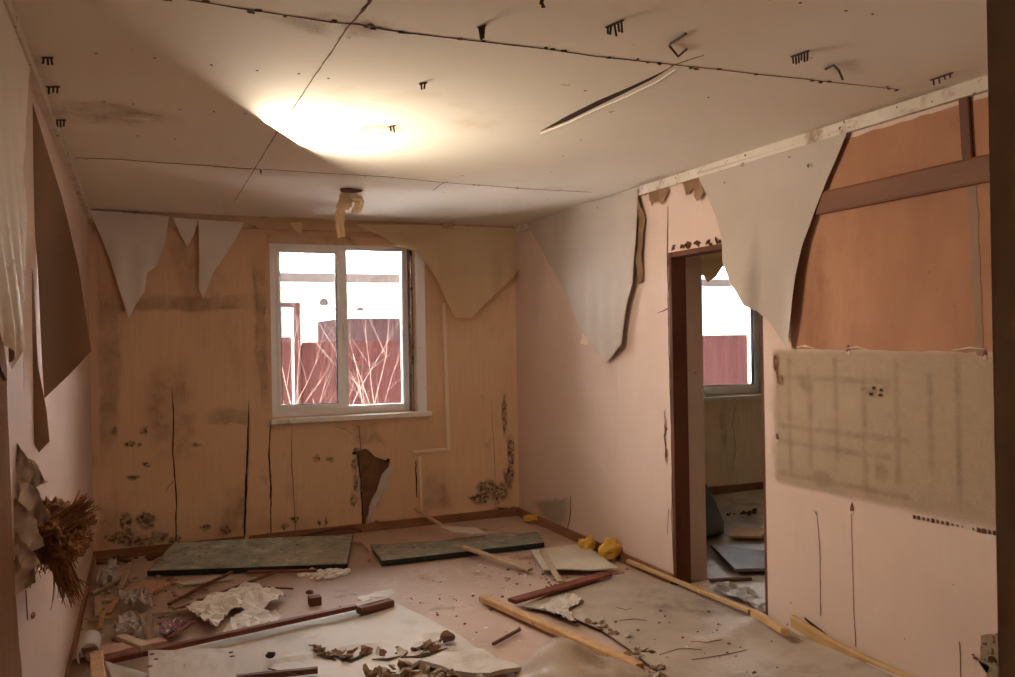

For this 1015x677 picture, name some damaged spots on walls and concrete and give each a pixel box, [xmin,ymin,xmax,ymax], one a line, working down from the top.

crack [90,0,901,202]
damp [88,485,184,549]
crack [166,387,177,541]
mould [468,388,515,510]
crack [849,516,857,647]